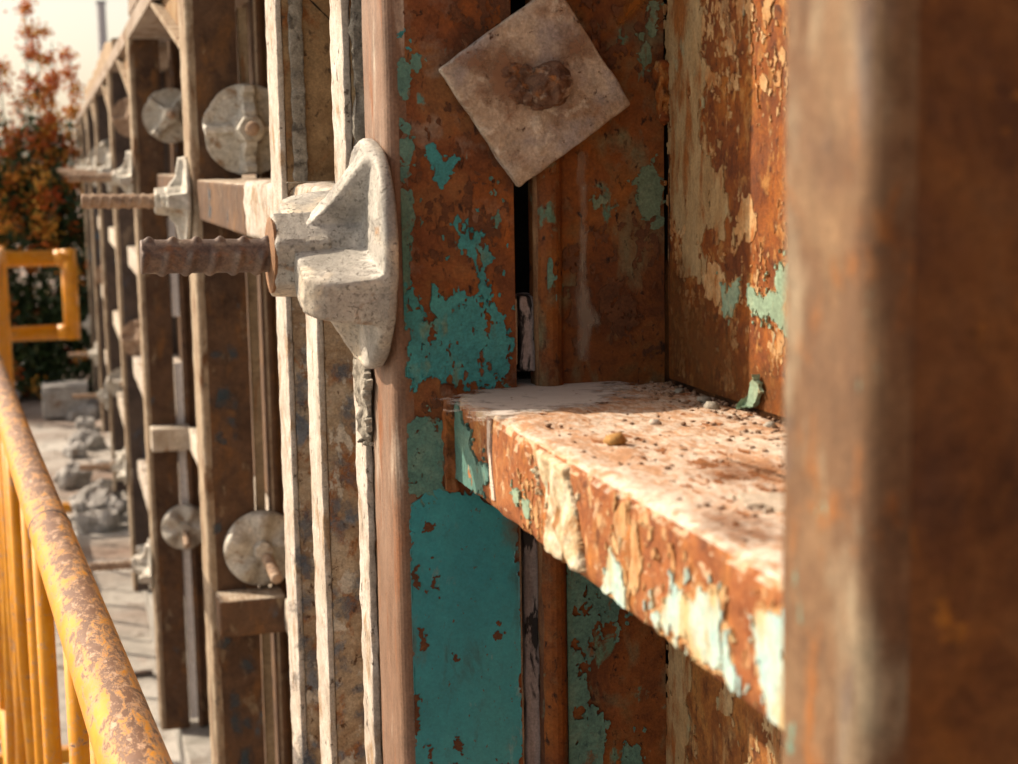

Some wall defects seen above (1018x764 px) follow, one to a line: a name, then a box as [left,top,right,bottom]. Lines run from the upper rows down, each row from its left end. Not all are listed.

peeling [397,28,427,101]
rust [443,0,510,57]
rust [399,101,465,191]
rust [407,131,512,274]
peeling [627,0,786,410]
peeling [399,118,515,394]
rust [417,628,430,651]
rust [411,564,441,599]
peeling [407,402,543,764]
peeling [566,491,784,764]
rust [414,694,423,736]
rust [453,736,464,764]